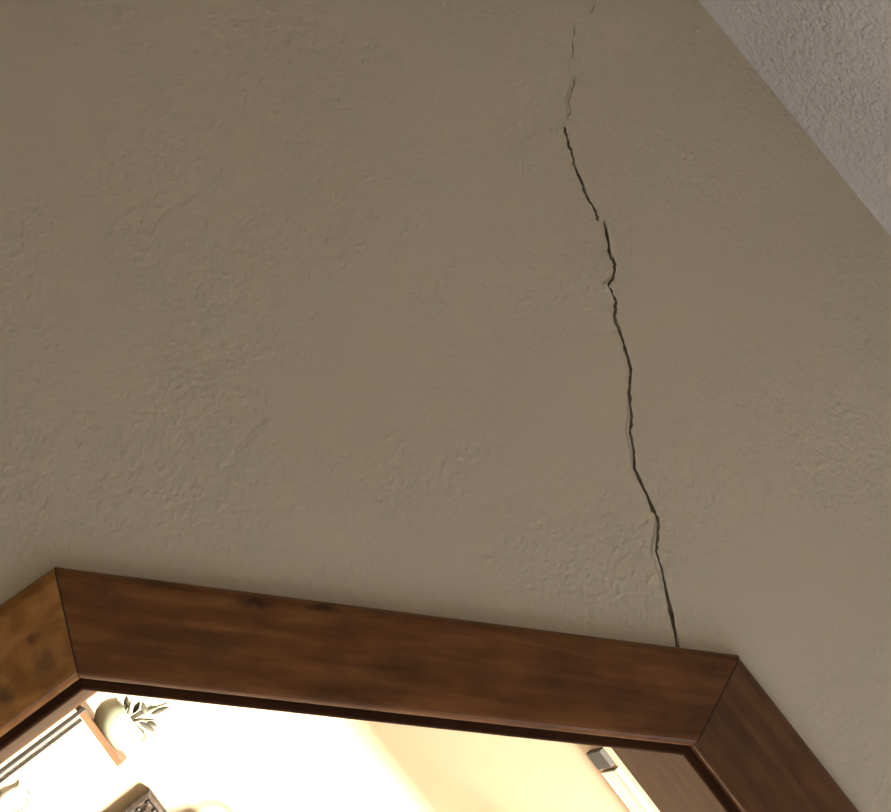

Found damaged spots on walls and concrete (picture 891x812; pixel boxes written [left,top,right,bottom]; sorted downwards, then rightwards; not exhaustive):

crack [564,27,679,648]